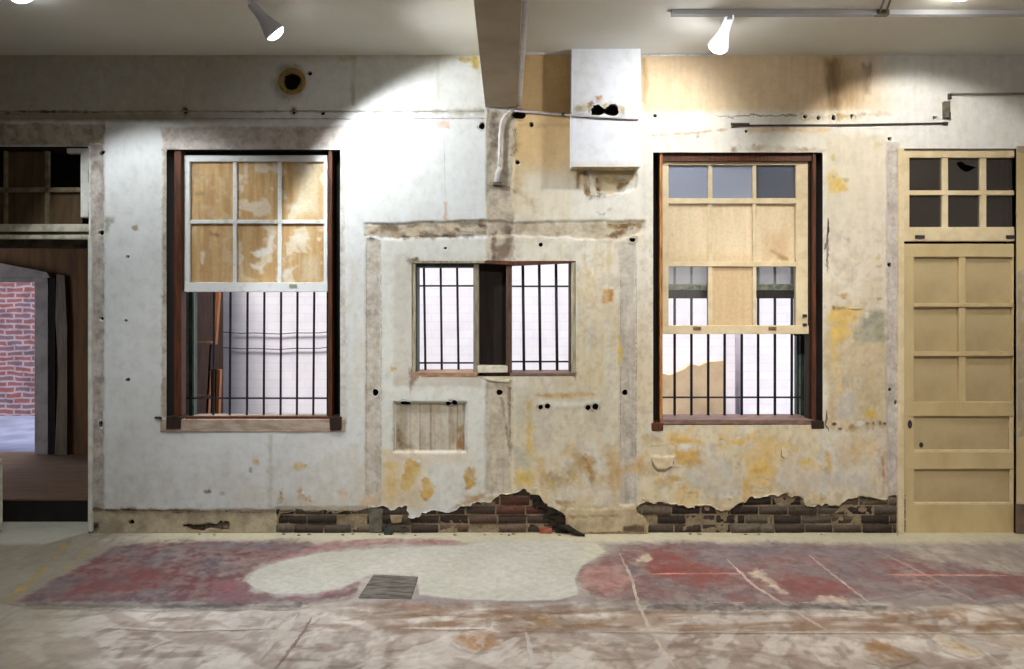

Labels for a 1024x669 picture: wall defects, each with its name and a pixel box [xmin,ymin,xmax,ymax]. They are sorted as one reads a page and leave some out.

leakage [819,55,846,114]
leakage [859,59,874,97]
crack [822,218,830,273]
peeling [0,107,1024,609]